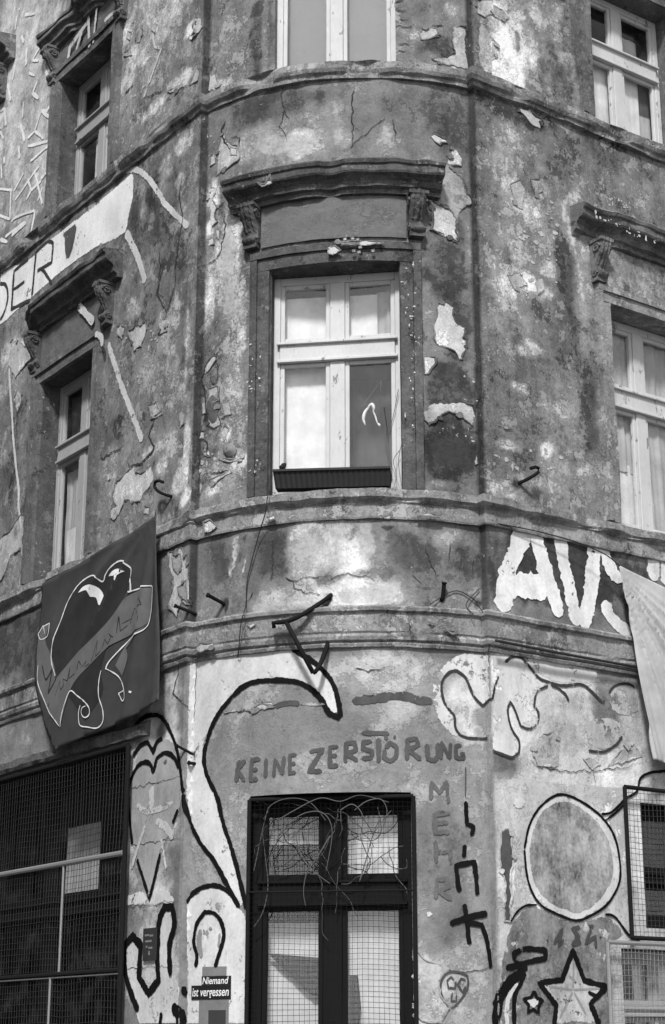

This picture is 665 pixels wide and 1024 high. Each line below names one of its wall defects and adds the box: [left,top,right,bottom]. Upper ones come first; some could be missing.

peeling [419,0,508,73]
crack [351,88,397,147]
peeling [428,133,472,244]
damp [561,191,585,302]
peeling [204,356,217,374]
peeling [409,300,469,398]
peeling [199,385,261,492]
peeling [404,400,479,465]
peeling [107,466,154,520]